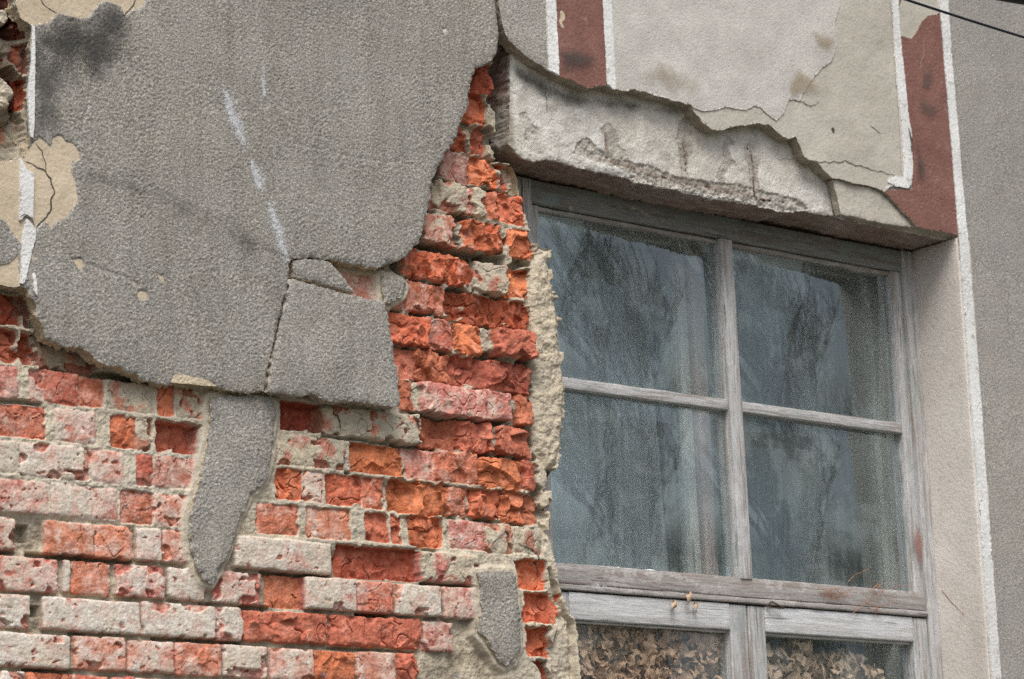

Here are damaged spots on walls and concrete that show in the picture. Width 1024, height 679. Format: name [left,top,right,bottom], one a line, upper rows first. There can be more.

crack [21,144,55,228]
spalling [0,0,145,365]
leakage [30,8,124,124]
peeling [574,0,939,213]
crack [778,158,900,177]
spalling [170,374,216,387]
crack [265,257,359,390]
spalling [385,63,540,527]
spalling [241,610,422,651]
spalling [514,557,563,679]